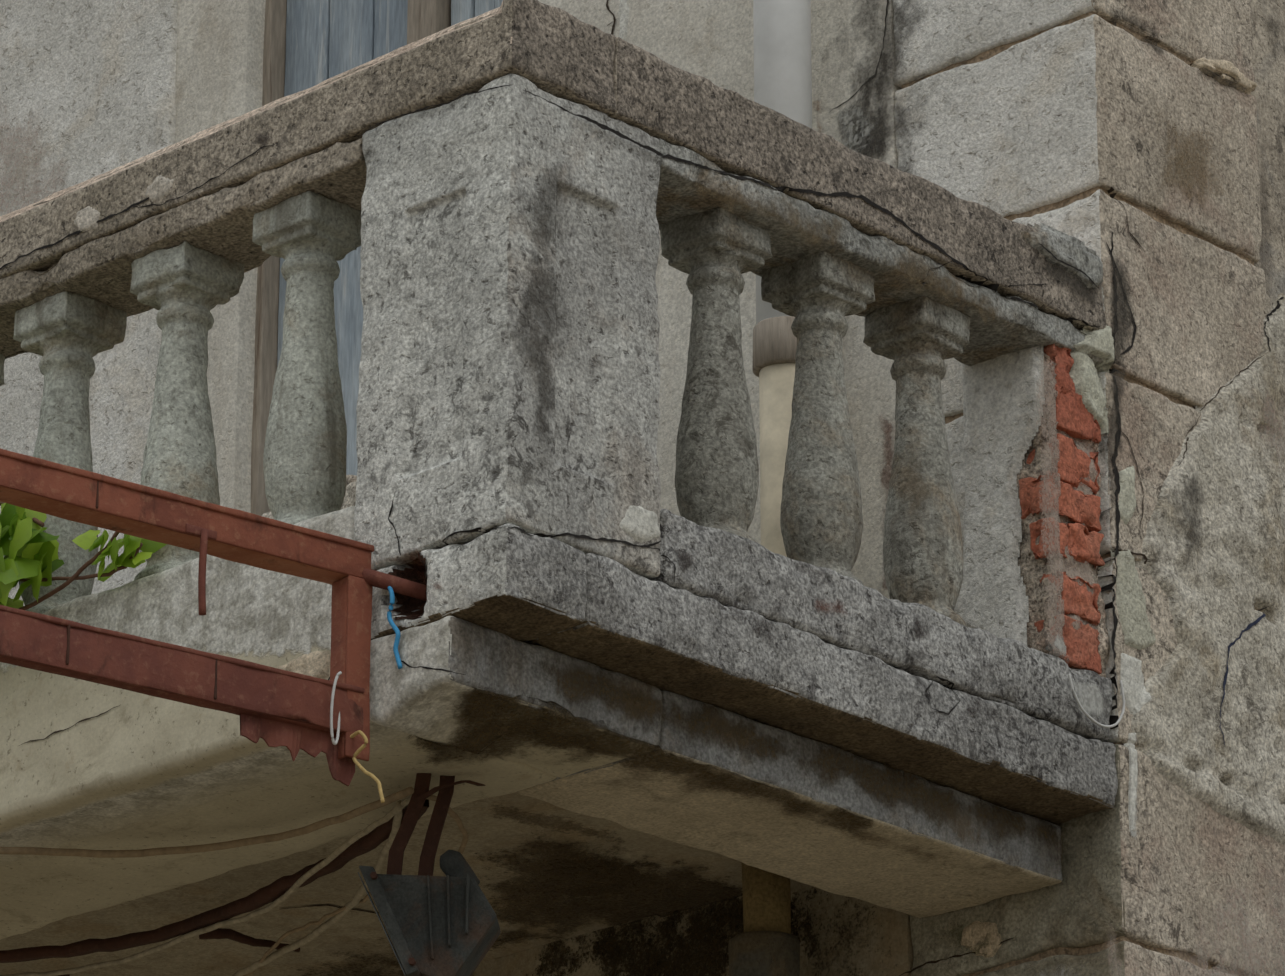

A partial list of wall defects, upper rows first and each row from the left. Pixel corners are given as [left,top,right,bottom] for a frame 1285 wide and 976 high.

crack [606,0,616,35]
water stain [839,0,921,157]
crack [0,141,279,270]
crack [358,84,1148,729]
crack [1178,297,1284,466]
flaking render [1019,344,1156,716]
crack [19,705,120,746]
water stain [409,663,1062,860]
crack [1220,606,1269,745]
water stain [479,805,744,976]
crack [899,938,1013,976]